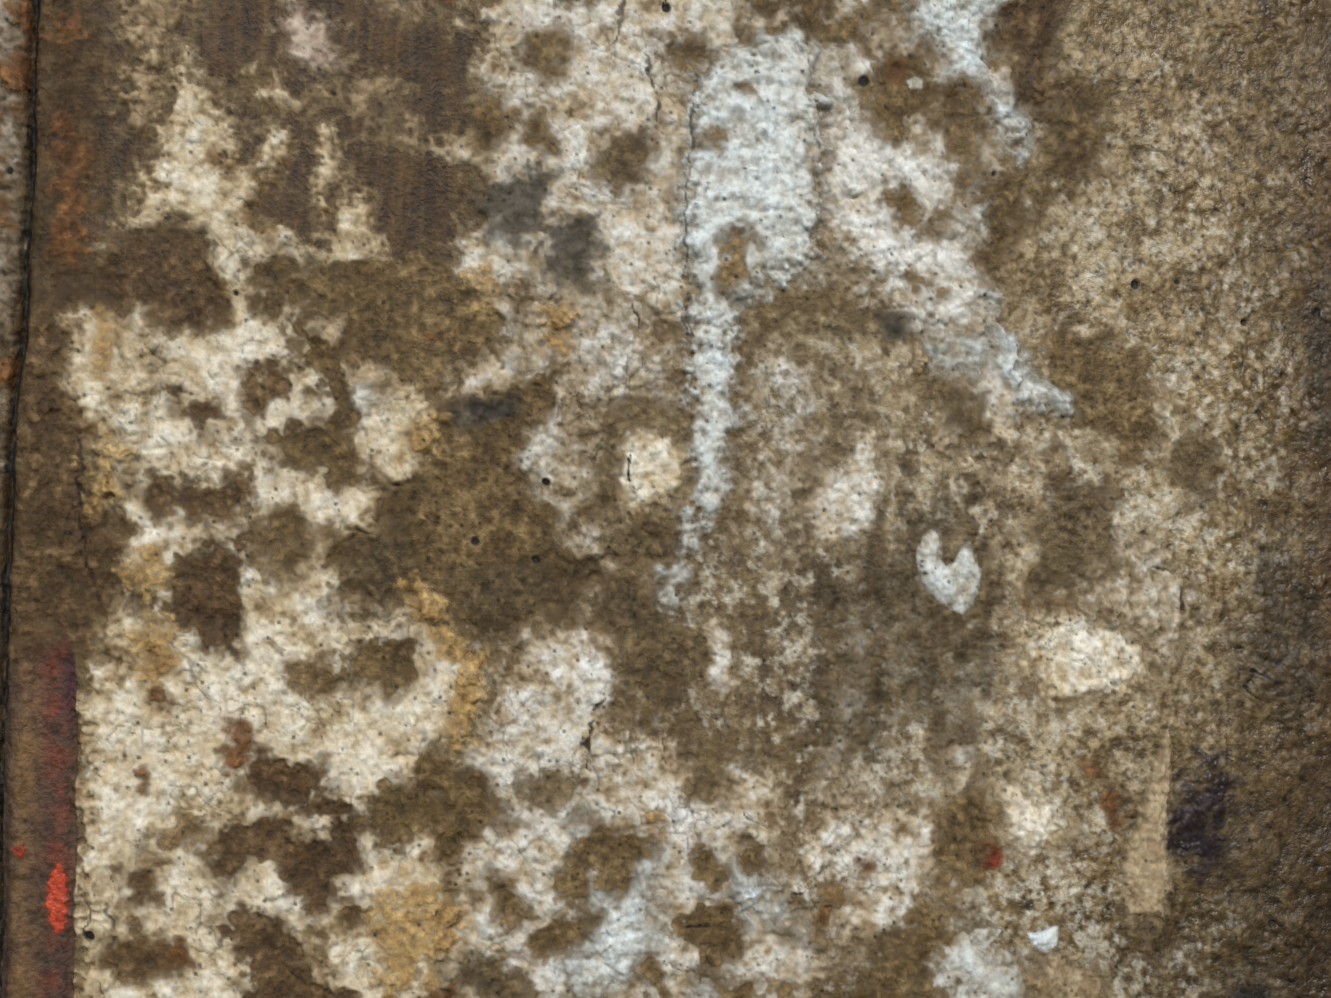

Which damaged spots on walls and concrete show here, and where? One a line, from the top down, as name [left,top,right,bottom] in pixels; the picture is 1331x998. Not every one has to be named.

peeling [907,77,923,89]
crack [647,56,695,268]
leakage [694,127,726,153]
leakage [713,226,895,568]
crack [0,0,40,987]
leakage [673,508,711,556]
peeling [917,531,982,613]
peeling [1028,924,1058,951]
leakage [1121,918,1172,968]